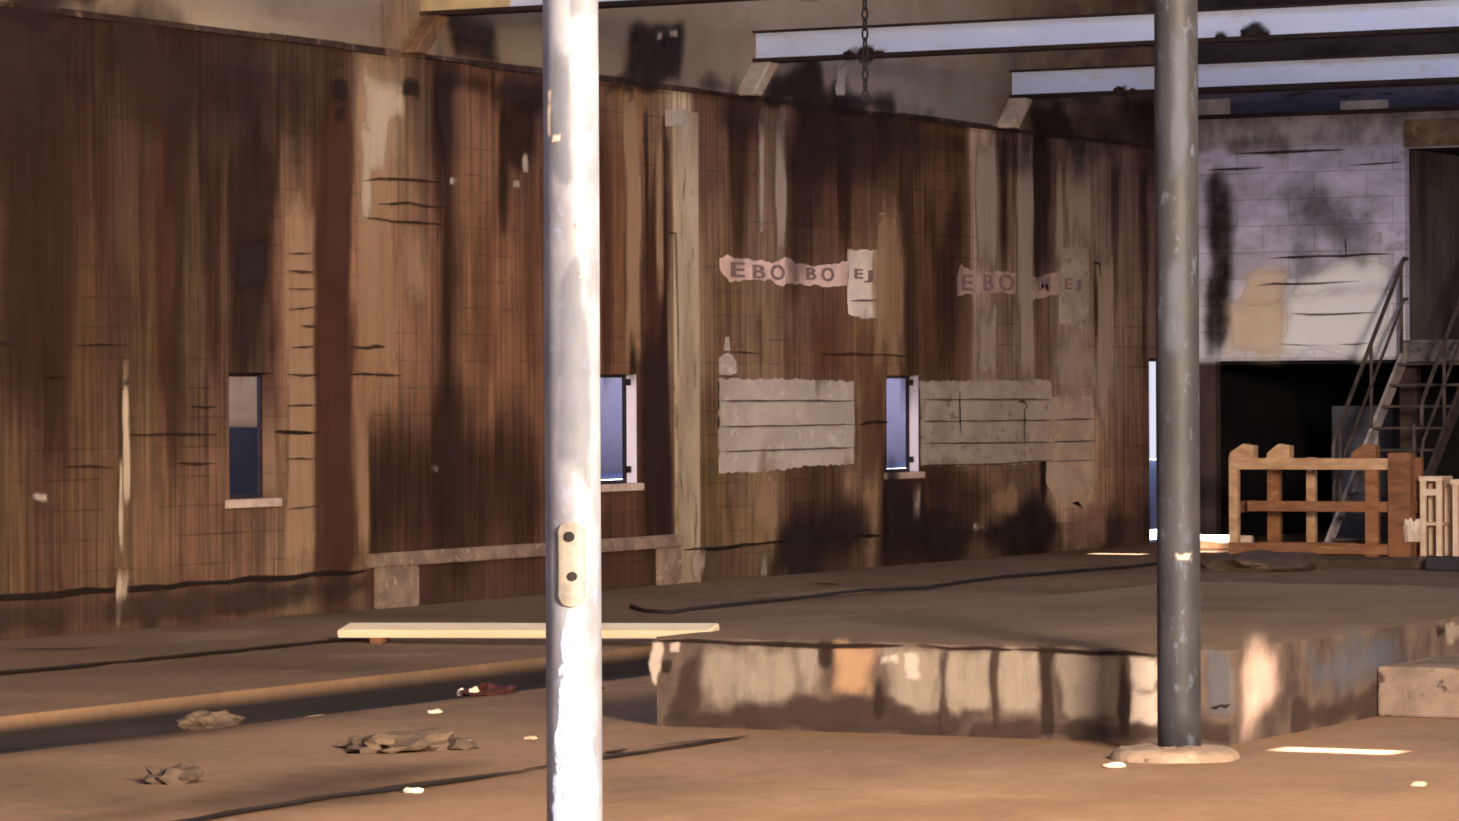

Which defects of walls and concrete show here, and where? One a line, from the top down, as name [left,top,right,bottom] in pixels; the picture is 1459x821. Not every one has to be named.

peeling [1243,233,1401,304]
water stain [1206,279,1228,348]
water stain [844,469,879,552]
peeling [552,612,598,821]